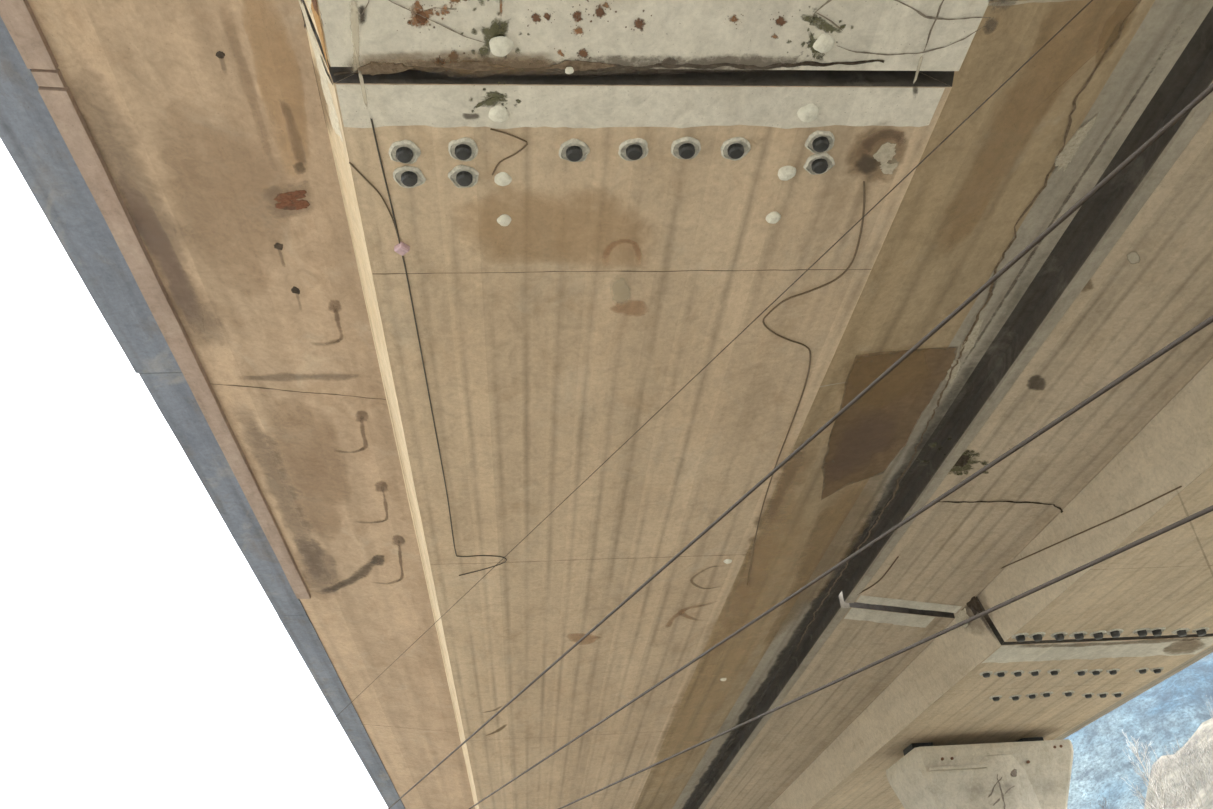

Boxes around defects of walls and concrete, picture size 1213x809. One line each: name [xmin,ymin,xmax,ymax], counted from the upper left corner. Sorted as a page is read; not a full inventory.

rust [397,0,467,31]
rust [527,9,555,27]
rust [554,0,617,60]
crack [300,0,991,85]
damp [464,97,499,119]
damp [1048,58,1160,227]
damp [682,240,1044,809]
crack [939,501,1063,513]
damp [325,556,384,591]
damp [1028,639,1202,652]